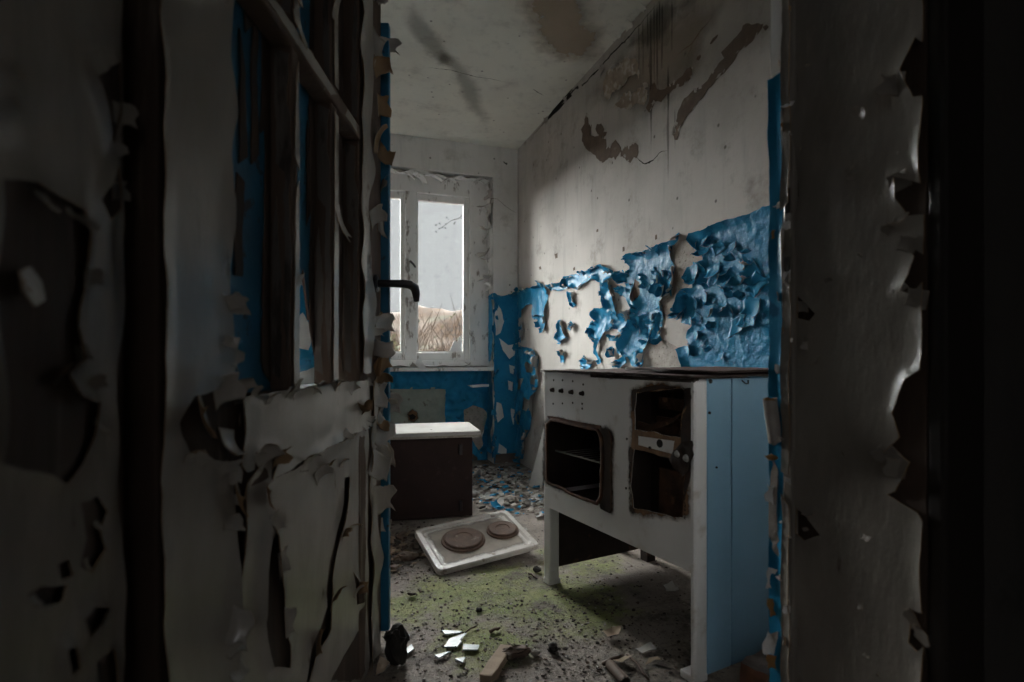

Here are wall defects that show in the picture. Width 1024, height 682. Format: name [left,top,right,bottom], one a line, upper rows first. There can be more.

peeling [331,0,343,101]
damp [532,0,596,57]
peeling [334,0,930,682]